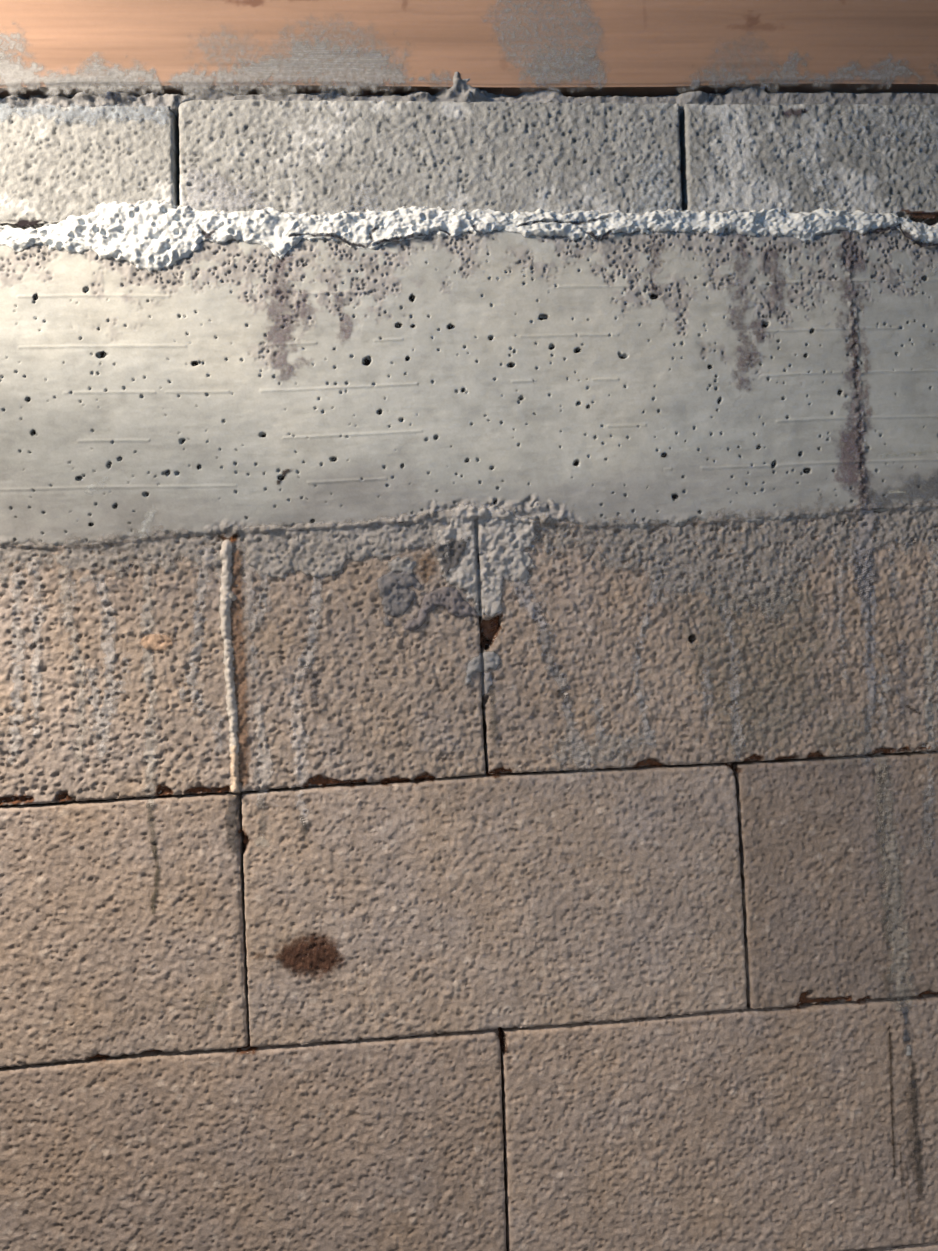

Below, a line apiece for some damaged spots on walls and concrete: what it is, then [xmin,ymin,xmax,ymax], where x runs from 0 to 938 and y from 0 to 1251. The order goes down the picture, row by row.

crack [200,227,217,238]
crack [289,225,482,248]
crack [518,217,611,240]
peeling [404,575,503,650]
water stain [0,509,454,913]
water stain [509,230,938,1212]